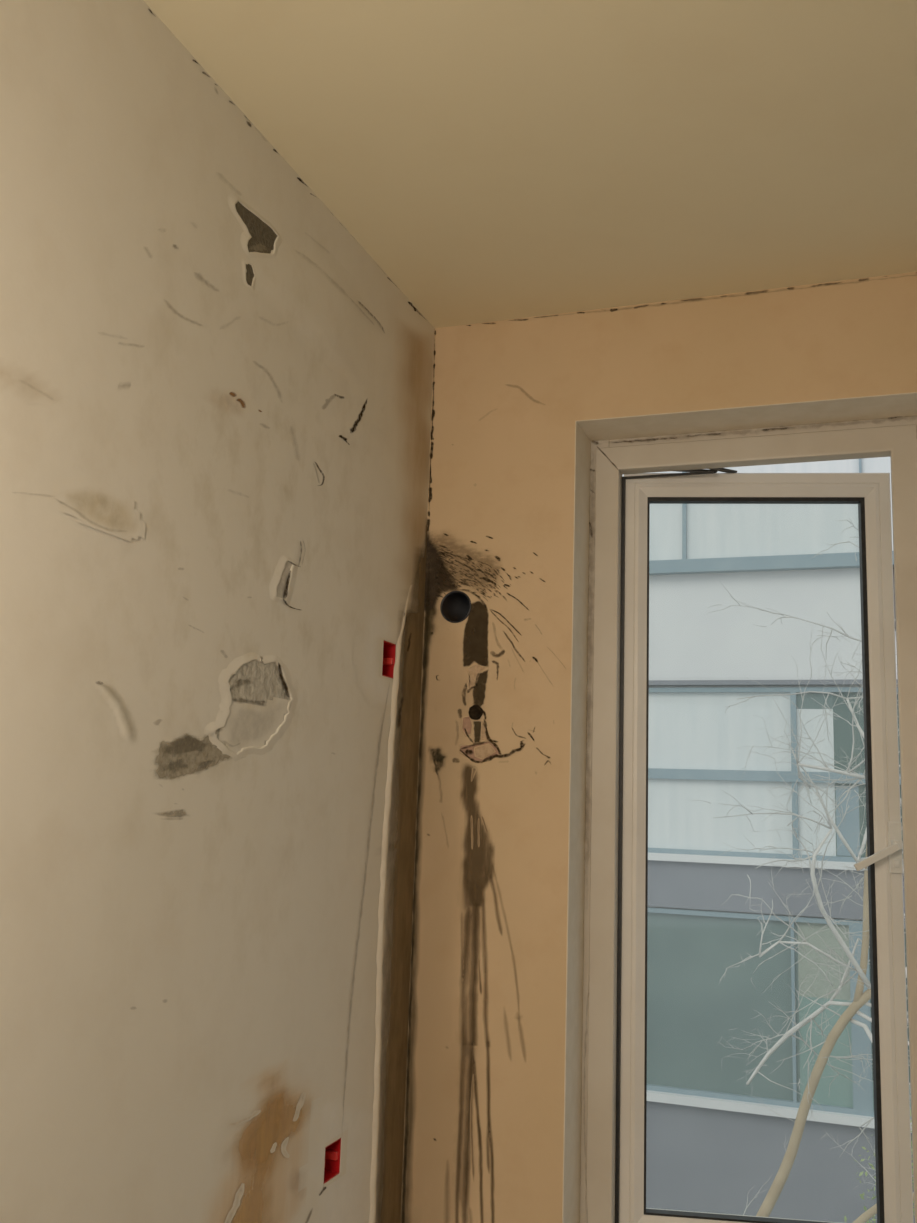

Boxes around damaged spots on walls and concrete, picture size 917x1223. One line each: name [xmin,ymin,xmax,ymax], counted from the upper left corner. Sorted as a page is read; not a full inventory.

spalling [227,193,283,290]
crack [0,356,64,406]
spalling [155,652,298,779]
damp [401,533,545,1223]
corrosion [189,1048,325,1223]